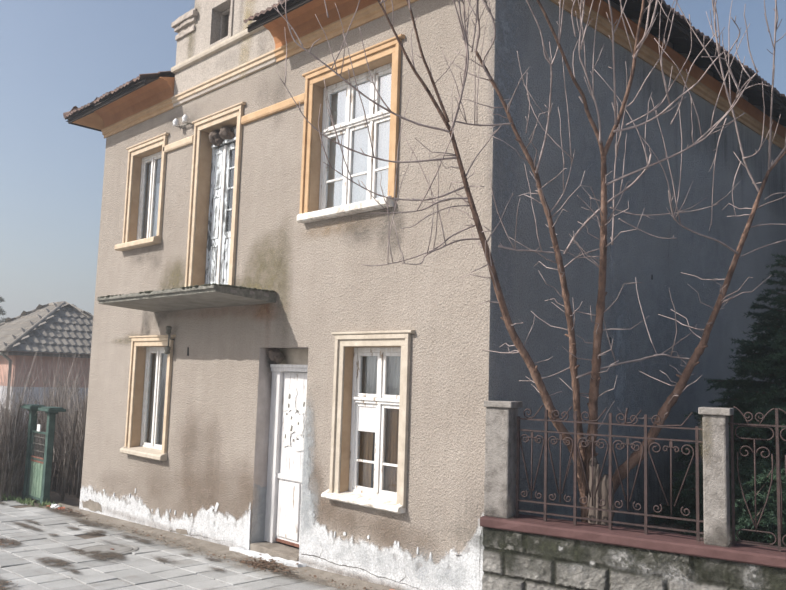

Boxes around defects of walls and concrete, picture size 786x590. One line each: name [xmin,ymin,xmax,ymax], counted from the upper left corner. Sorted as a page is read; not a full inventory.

flaking render [79,486,252,550]
flaking render [299,407,484,590]